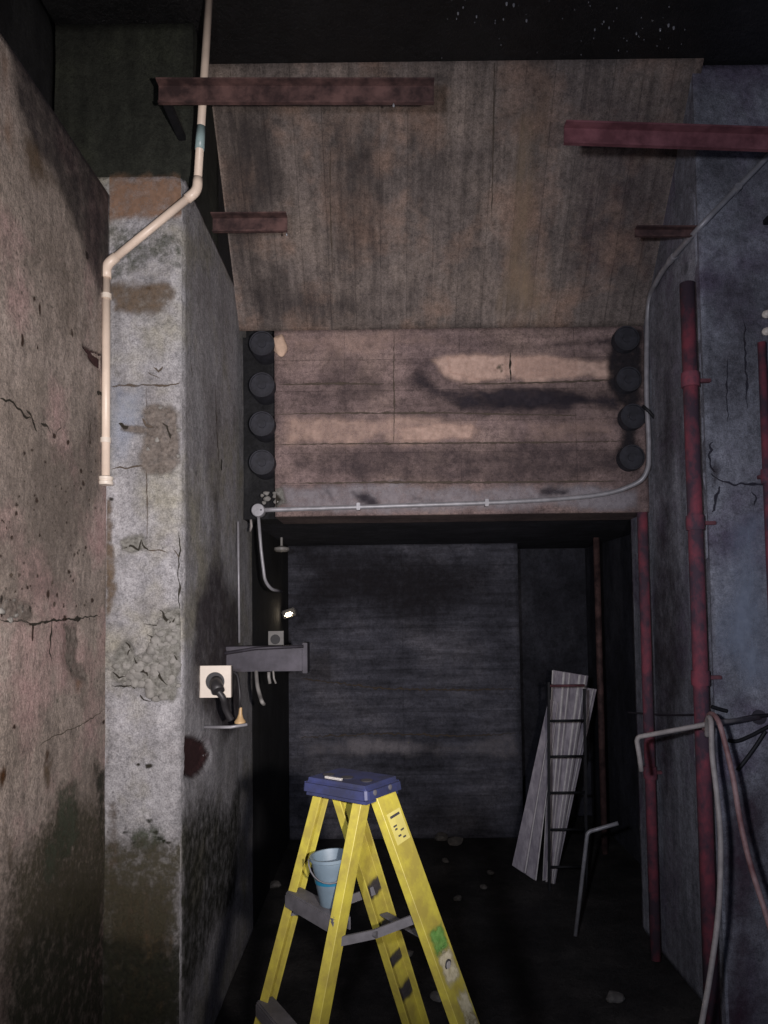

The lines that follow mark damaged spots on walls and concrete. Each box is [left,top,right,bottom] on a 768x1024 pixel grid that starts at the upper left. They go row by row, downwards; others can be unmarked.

damp [415,329,643,410]
crack [0,398,61,433]
spalling [119,405,182,474]
crack [708,442,763,512]
crack [1,615,99,669]
spalling [112,608,182,702]
damp [7,767,105,968]